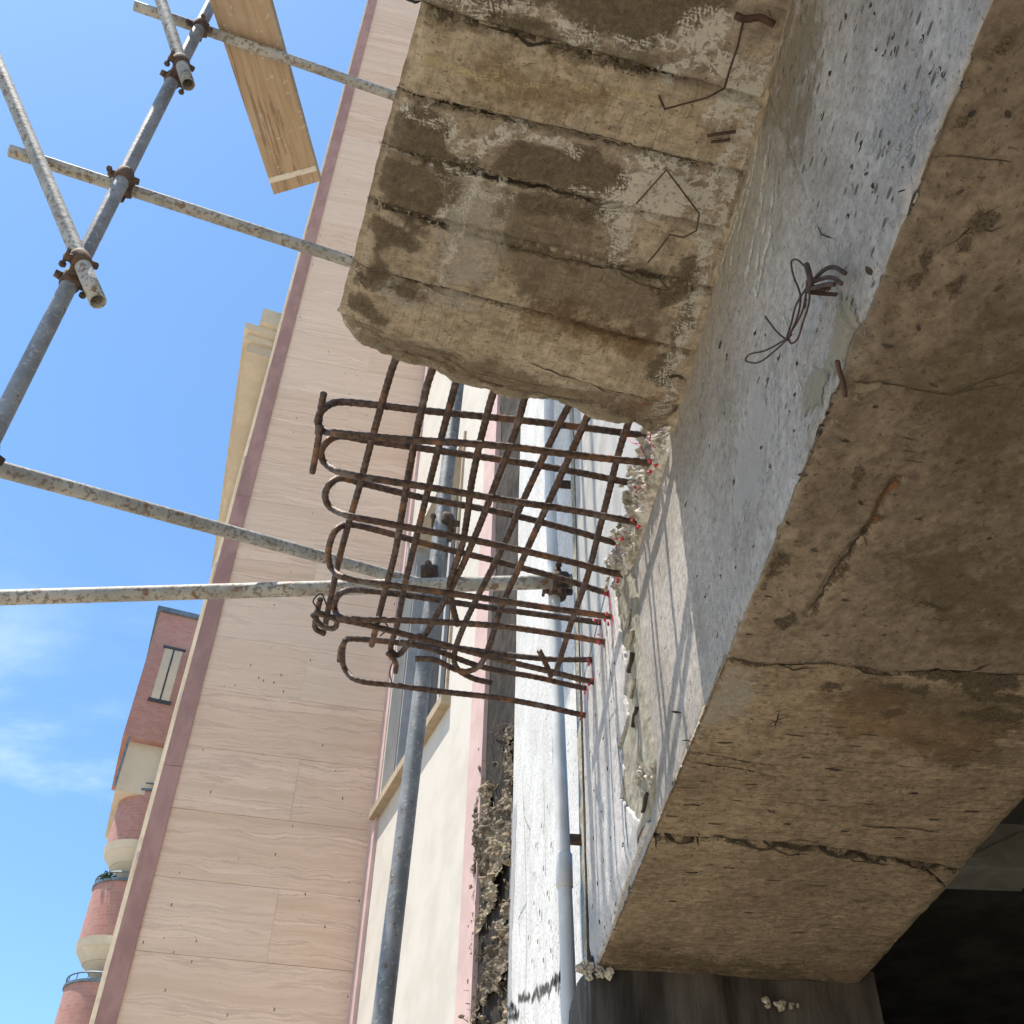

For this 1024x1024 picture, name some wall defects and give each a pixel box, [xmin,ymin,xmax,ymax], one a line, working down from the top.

crack [397,86,718,172]
crack [366,197,666,289]
crack [379,141,655,214]
leakage [348,0,774,416]
spalling [309,314,671,838]
crack [728,658,1024,687]
crack [653,826,957,887]